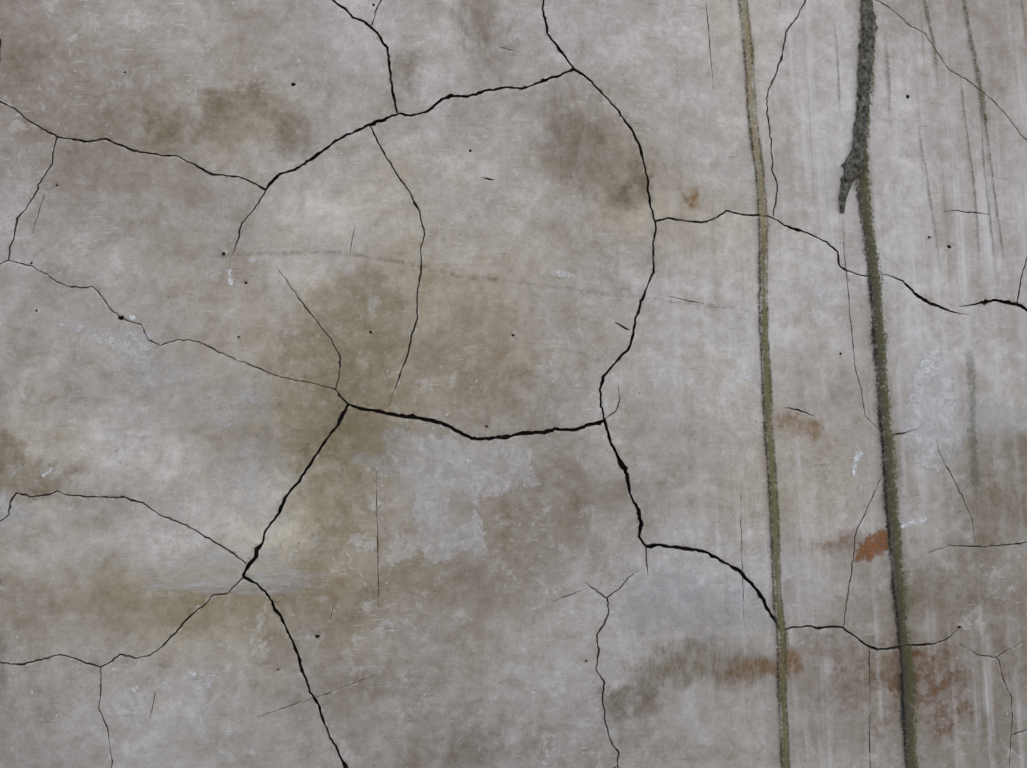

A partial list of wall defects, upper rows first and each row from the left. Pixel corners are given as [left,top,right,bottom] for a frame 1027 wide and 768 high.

crack [876,0,1027,140]
crack [0,0,868,420]
crack [880,257,1027,315]
crack [0,267,901,768]
rust [855,530,889,562]
crack [928,463,1027,553]
crack [906,627,959,646]
crack [964,643,1027,768]